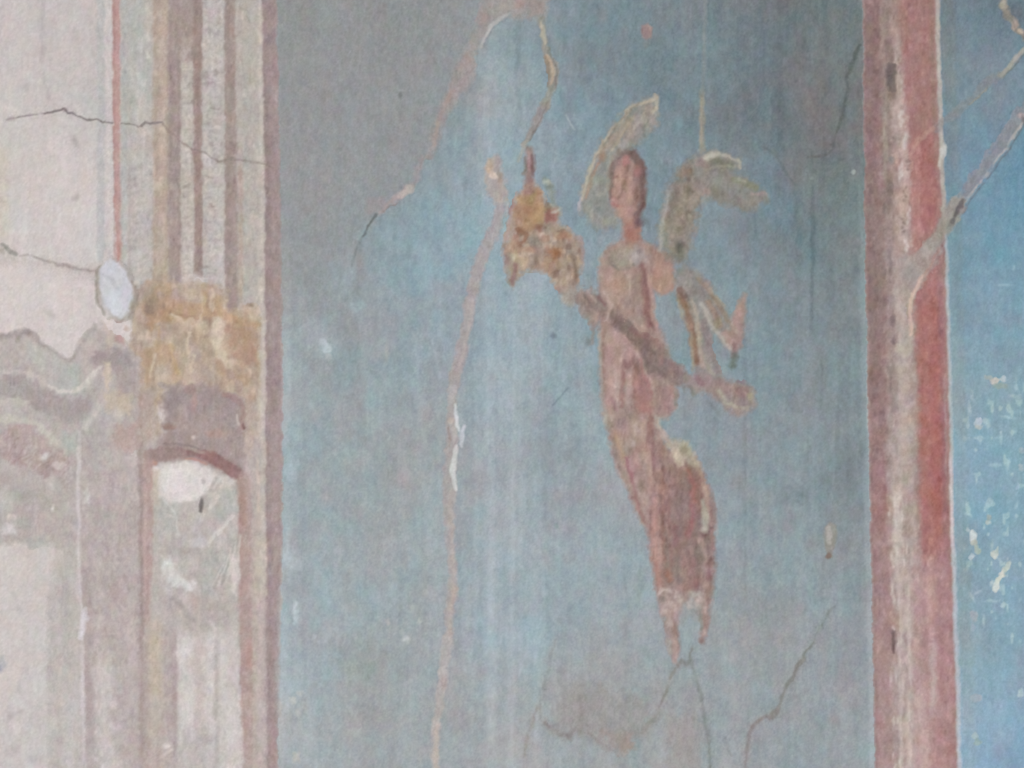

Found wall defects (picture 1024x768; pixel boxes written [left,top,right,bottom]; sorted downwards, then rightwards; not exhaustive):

crack [4,105,280,170]
crack [0,242,100,286]
peeling [965,514,1012,609]
crack [519,635,618,762]
crack [651,601,839,768]